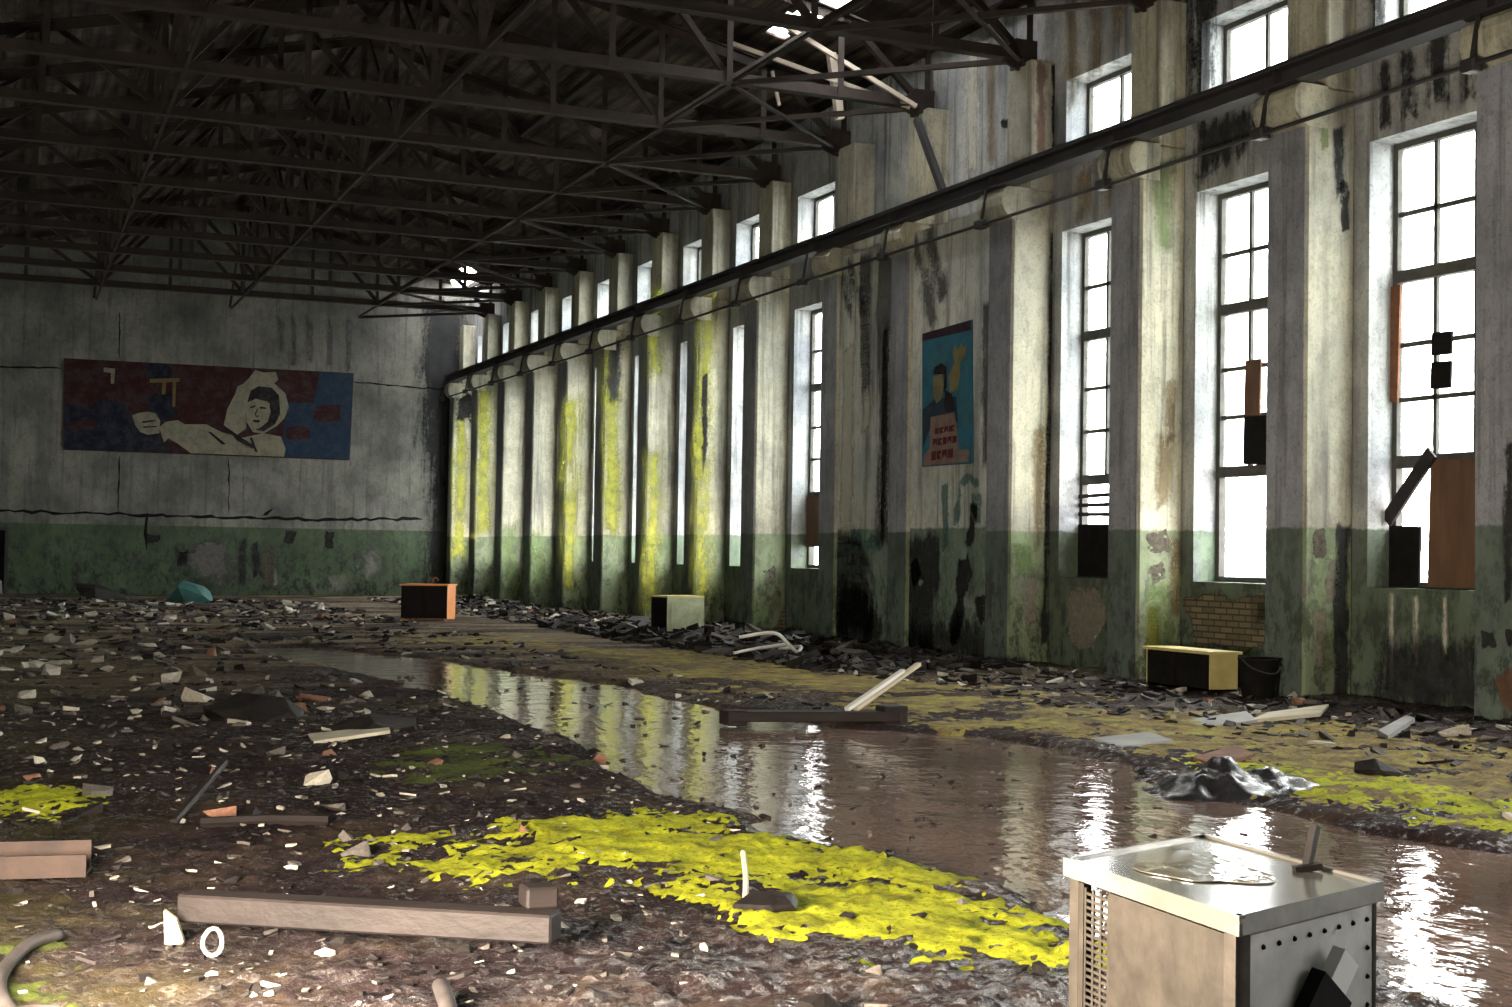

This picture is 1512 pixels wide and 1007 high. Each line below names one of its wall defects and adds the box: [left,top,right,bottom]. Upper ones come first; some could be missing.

damp [1373,0,1386,26]
peeling [177,535,275,587]
damp [908,501,985,657]
flaking render [1146,529,1265,656]